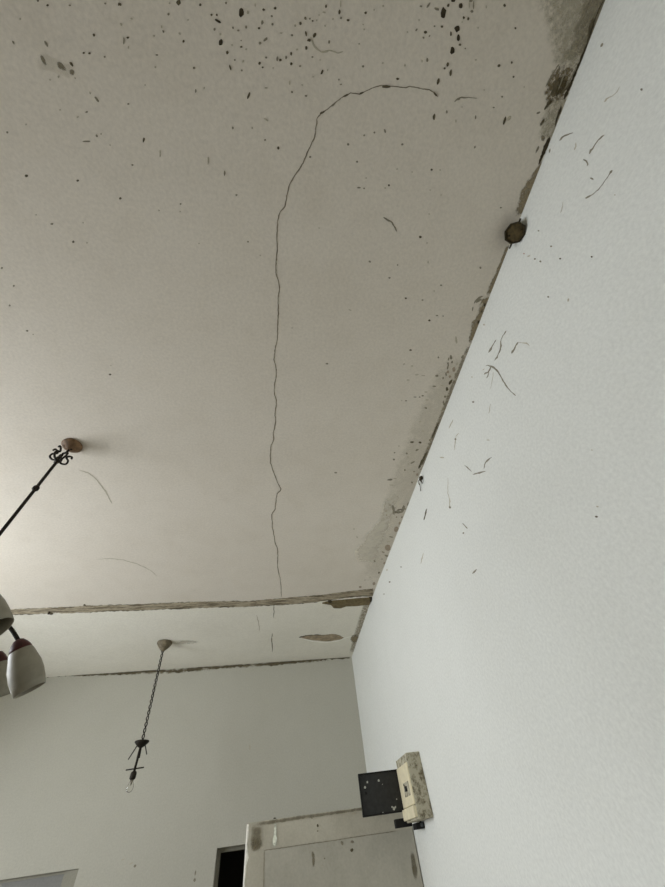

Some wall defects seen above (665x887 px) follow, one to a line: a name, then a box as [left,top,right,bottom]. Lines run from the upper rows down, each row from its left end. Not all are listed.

damp [572,0,603,53]
damp [537,64,577,125]
crack [47,85,472,678]
damp [423,348,469,465]
peeling [299,634,352,643]